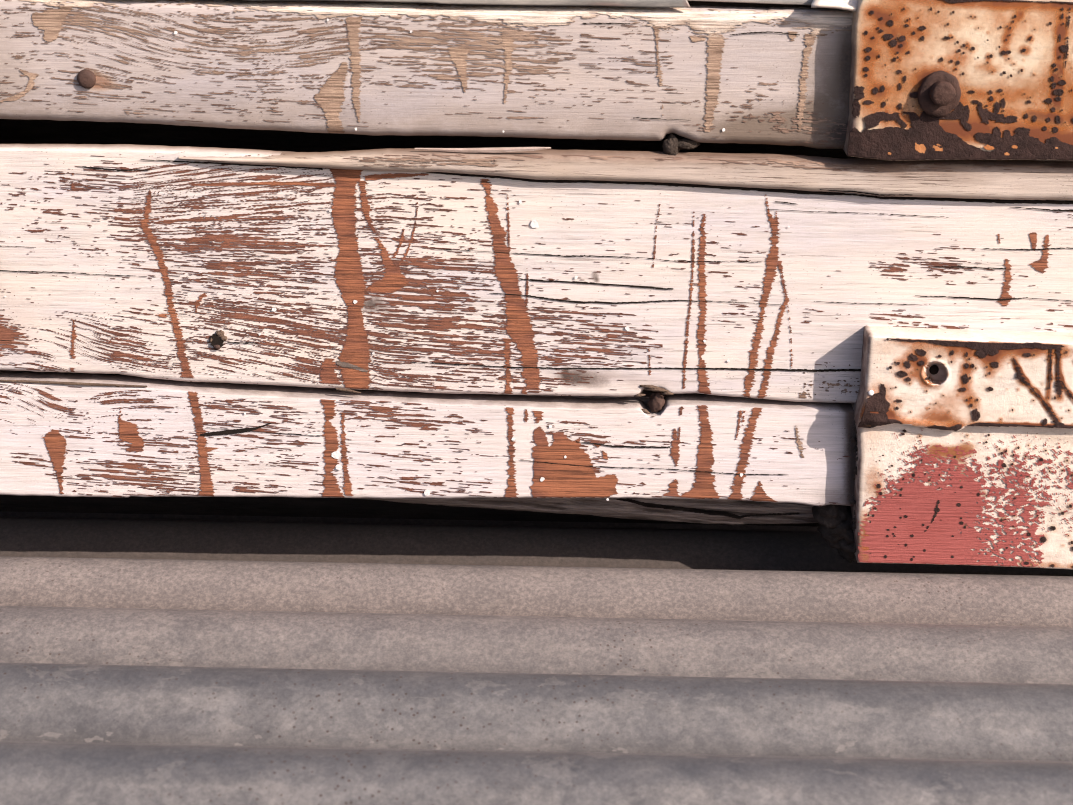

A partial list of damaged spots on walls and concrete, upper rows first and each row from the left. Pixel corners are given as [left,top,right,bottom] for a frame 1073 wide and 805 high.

peeling [0,0,847,148]
corrosion [847,0,1073,161]
peeling [702,158,951,172]
peeling [0,151,860,502]
peeling [871,309,983,330]
peeling [870,211,1073,323]
crack [200,423,321,436]
crack [521,441,785,475]
crack [614,498,799,519]
peeling [857,429,1073,568]
corrosion [858,338,1073,561]